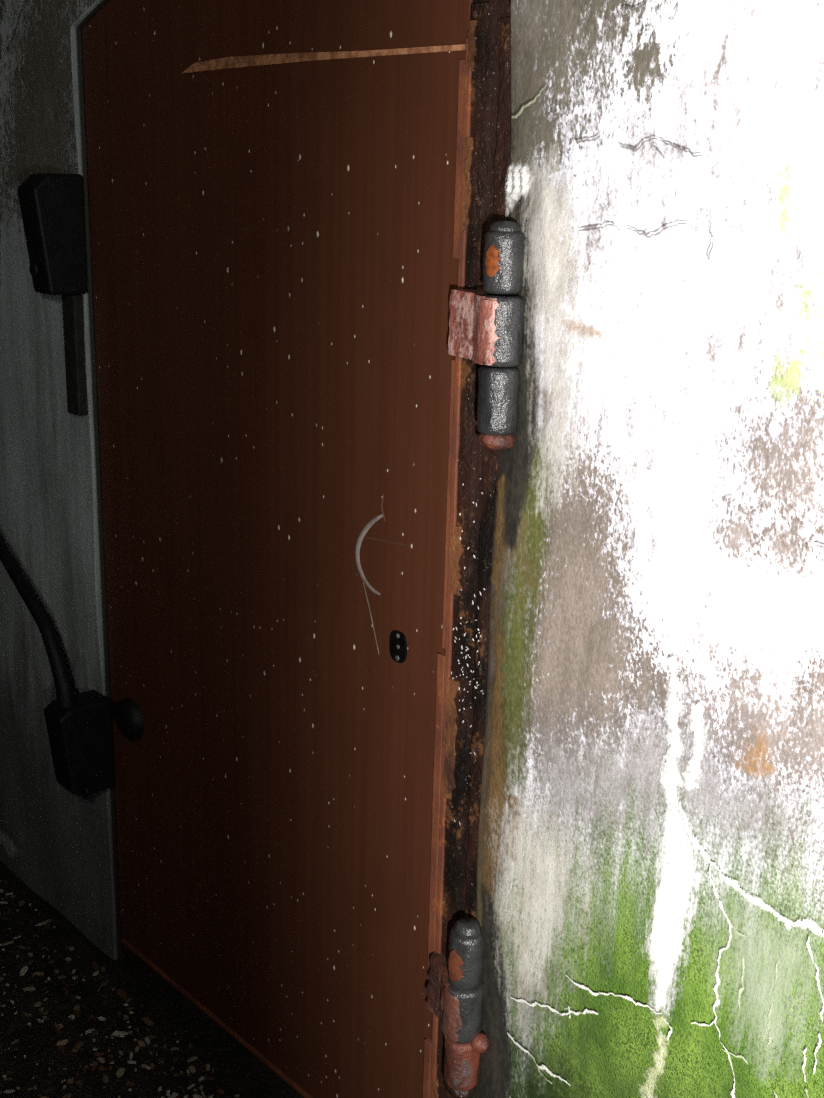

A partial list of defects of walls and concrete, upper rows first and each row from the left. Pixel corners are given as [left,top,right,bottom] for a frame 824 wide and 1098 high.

leakage [504,164,585,549]
crack [576,136,703,158]
crack [578,223,714,260]
leakage [476,656,824,1098]
crack [507,801,824,1098]